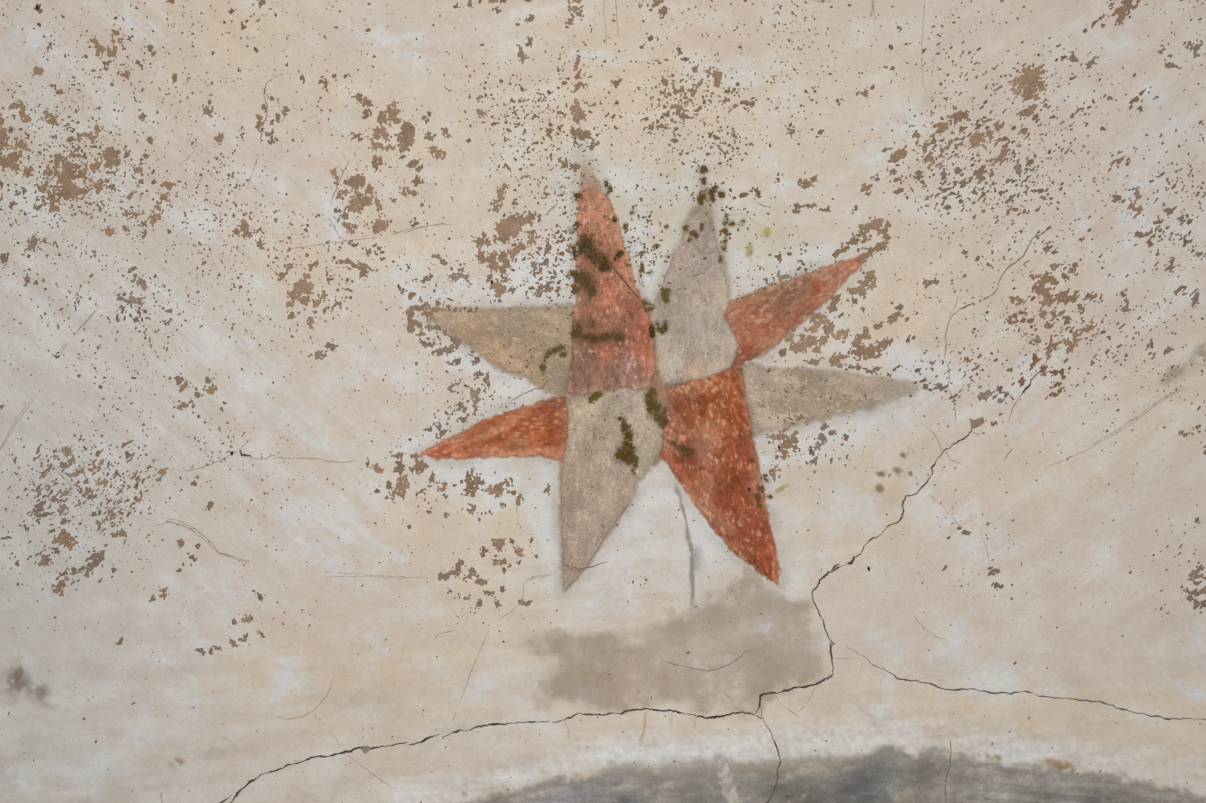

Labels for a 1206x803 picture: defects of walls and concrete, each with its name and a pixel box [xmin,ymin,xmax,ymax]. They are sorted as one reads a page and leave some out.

crack [185,439,356,471]
crack [219,229,1206,803]
peeling [928,489,1022,566]
peeling [944,559,1027,605]
peeling [1129,505,1206,619]